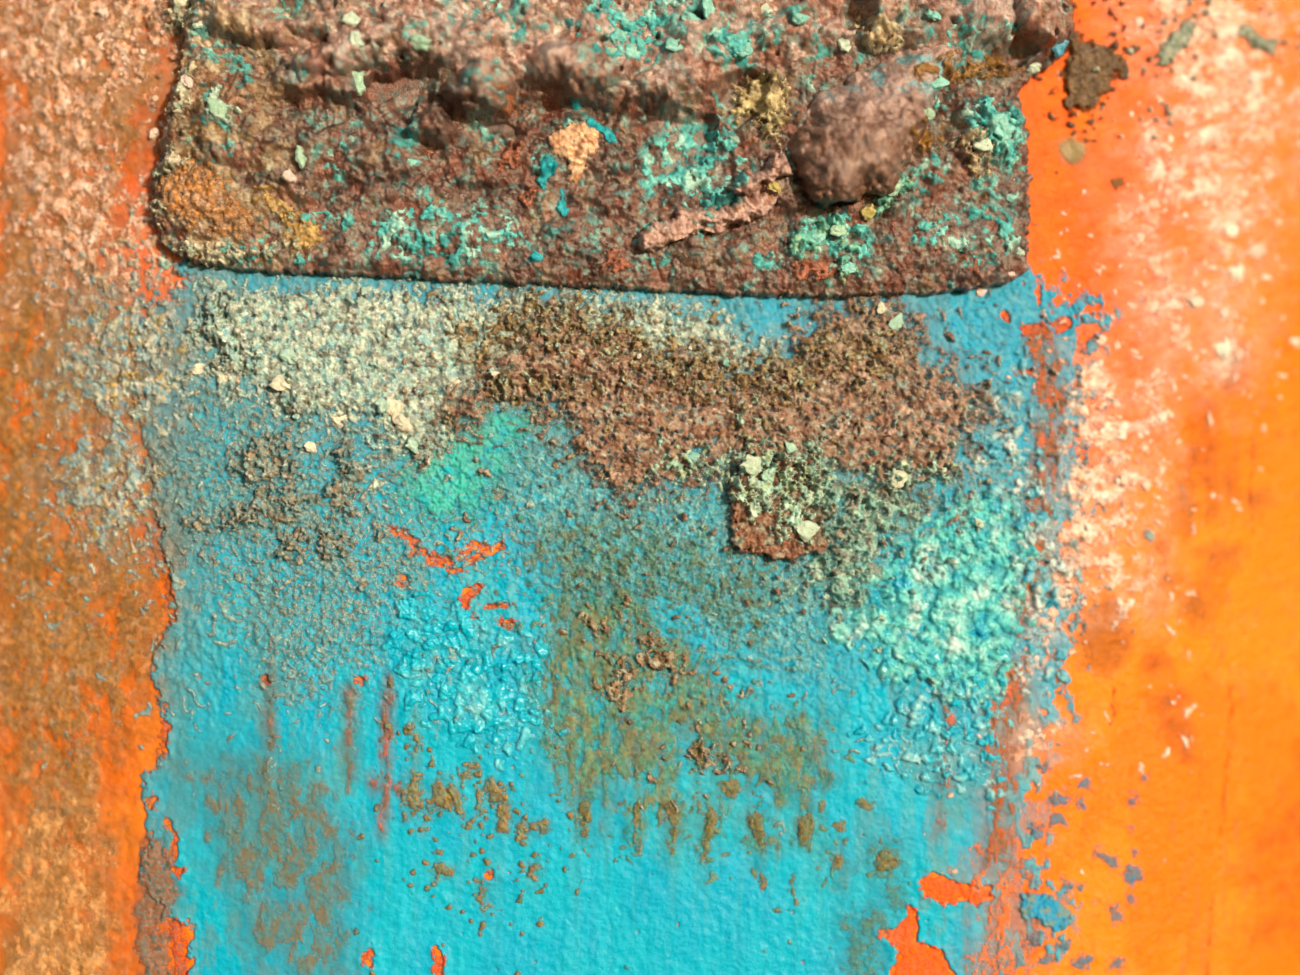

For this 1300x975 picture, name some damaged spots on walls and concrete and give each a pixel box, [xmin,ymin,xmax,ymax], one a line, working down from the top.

rust [498,139,523,171]
peeling [997,312,1088,351]
rust [395,150,1067,638]
peeling [125,523,179,622]
peeling [385,524,518,630]
peeling [113,673,210,774]
peeling [376,698,440,751]
rust [939,681,957,788]
rust [984,656,1028,868]
peeling [145,792,187,880]
peeling [167,917,189,975]
peeling [877,837,1043,975]